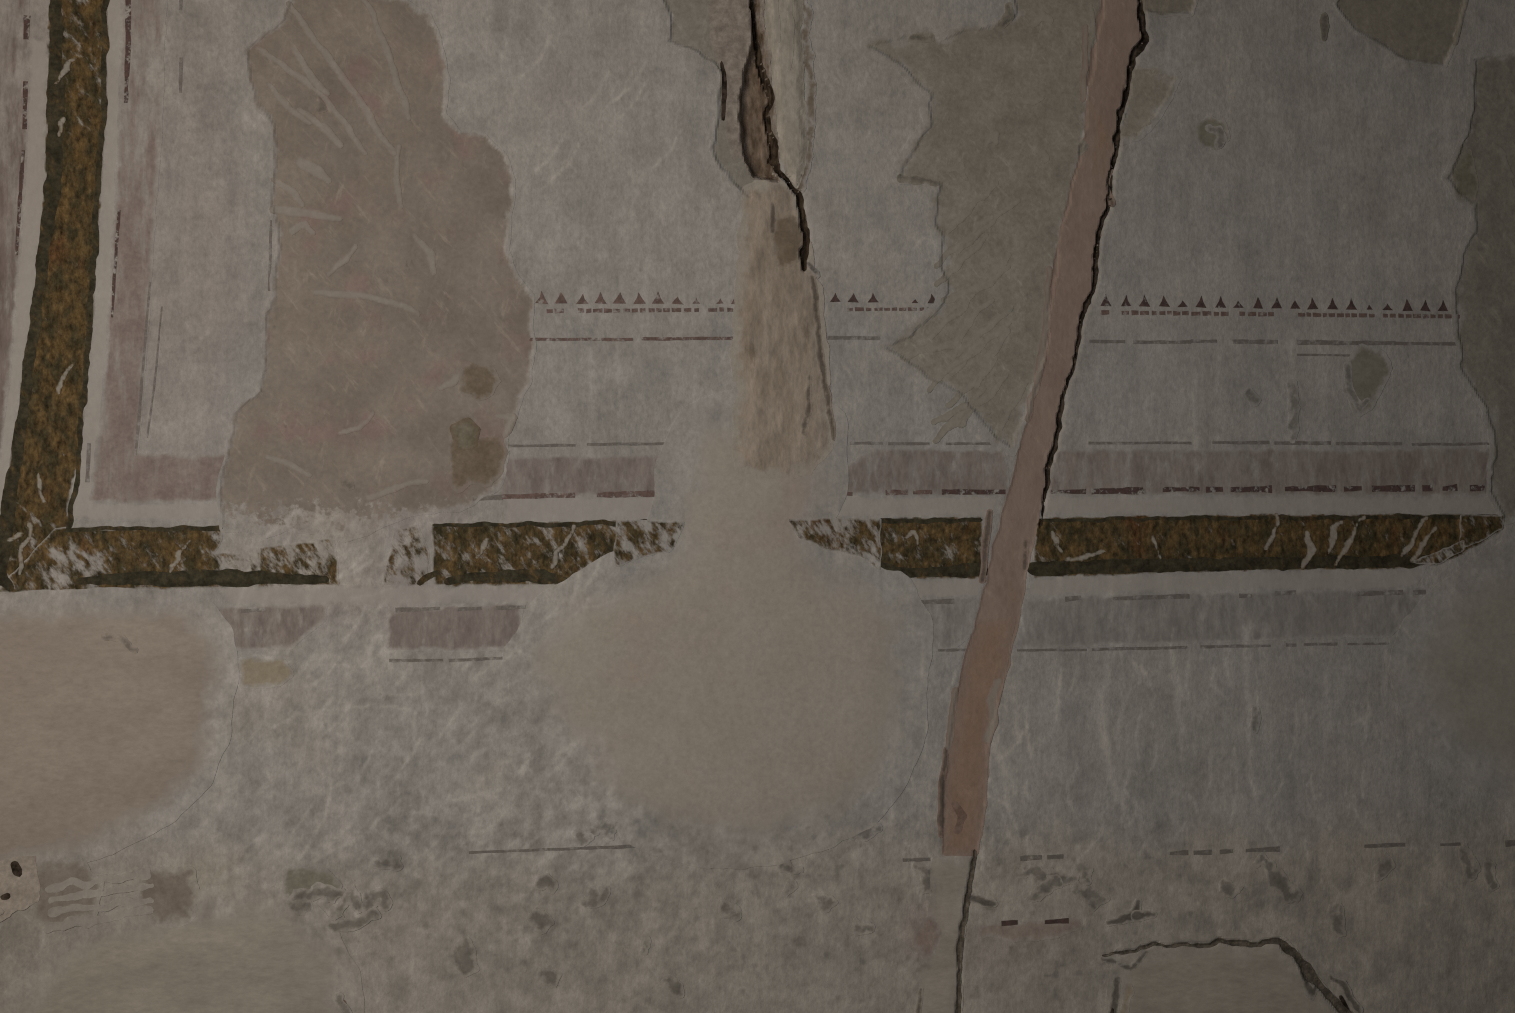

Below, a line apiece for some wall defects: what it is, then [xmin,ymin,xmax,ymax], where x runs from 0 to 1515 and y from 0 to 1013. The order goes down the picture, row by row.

peeling [216,0,536,543]
peeling [661,0,809,195]
crack [737,0,836,441]
peeling [861,0,1101,457]
crack [1039,0,1149,526]
peeling [1319,0,1515,525]
crack [915,850,998,1013]
crack [1100,938,1363,1013]